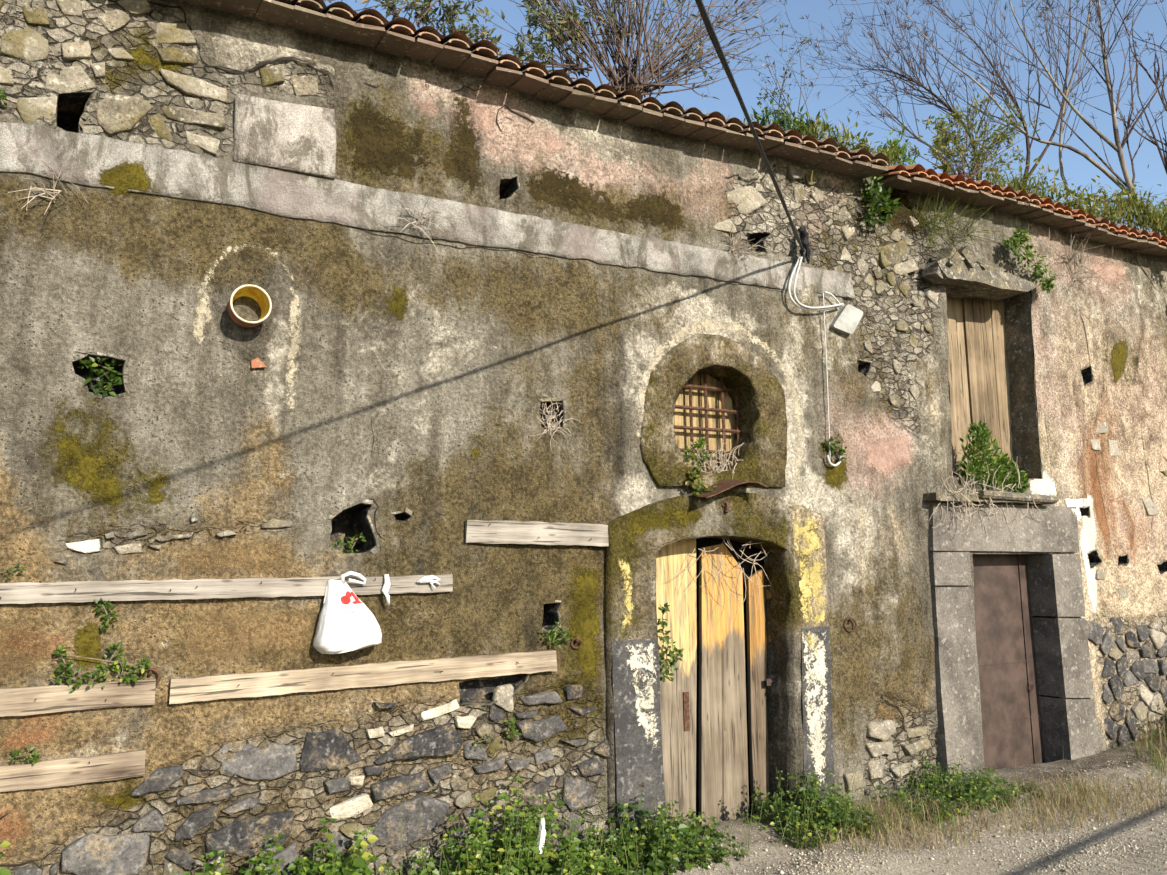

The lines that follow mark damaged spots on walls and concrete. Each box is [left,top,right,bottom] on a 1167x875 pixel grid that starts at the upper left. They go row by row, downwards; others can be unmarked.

spalling [52,90,96,133]
spalling [747,232,771,256]
spalling [72,352,129,402]
spalling [857,359,872,375]
spalling [327,498,380,554]
spalling [391,508,413,521]
corrosion [691,480,768,499]
corrosion [1091,450,1110,555]
peeling [792,516,828,786]
peeling [626,643,659,748]